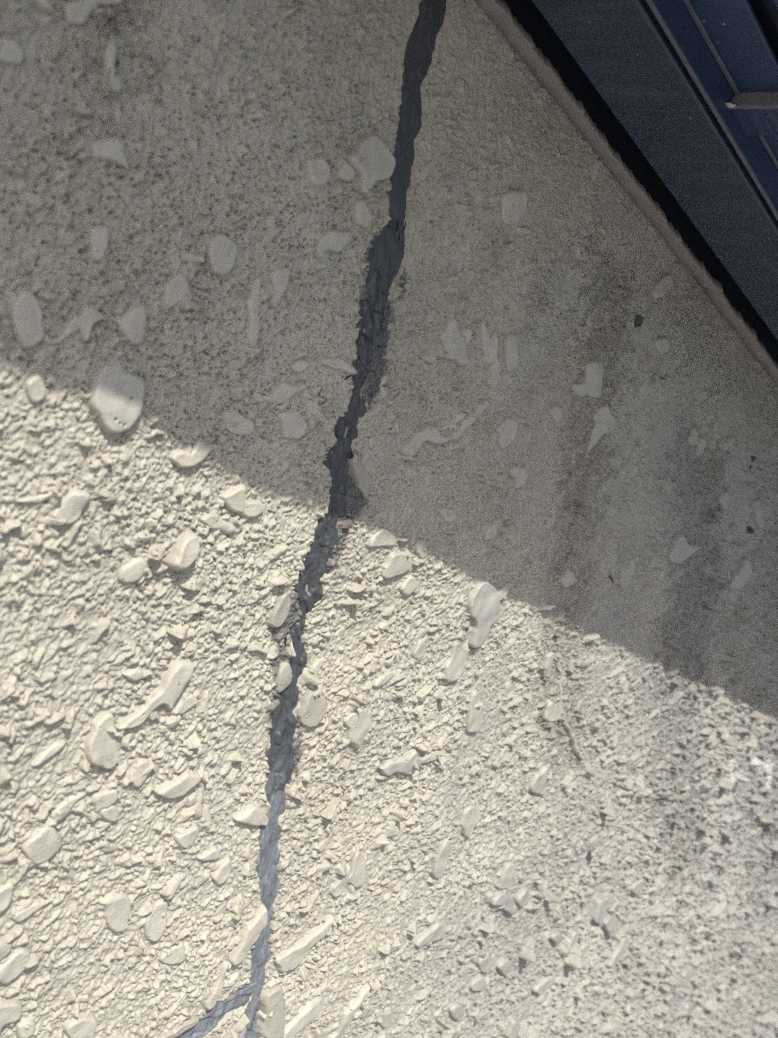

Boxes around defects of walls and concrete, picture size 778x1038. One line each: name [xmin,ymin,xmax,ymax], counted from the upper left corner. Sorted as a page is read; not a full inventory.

crack [175,0,447,1038]